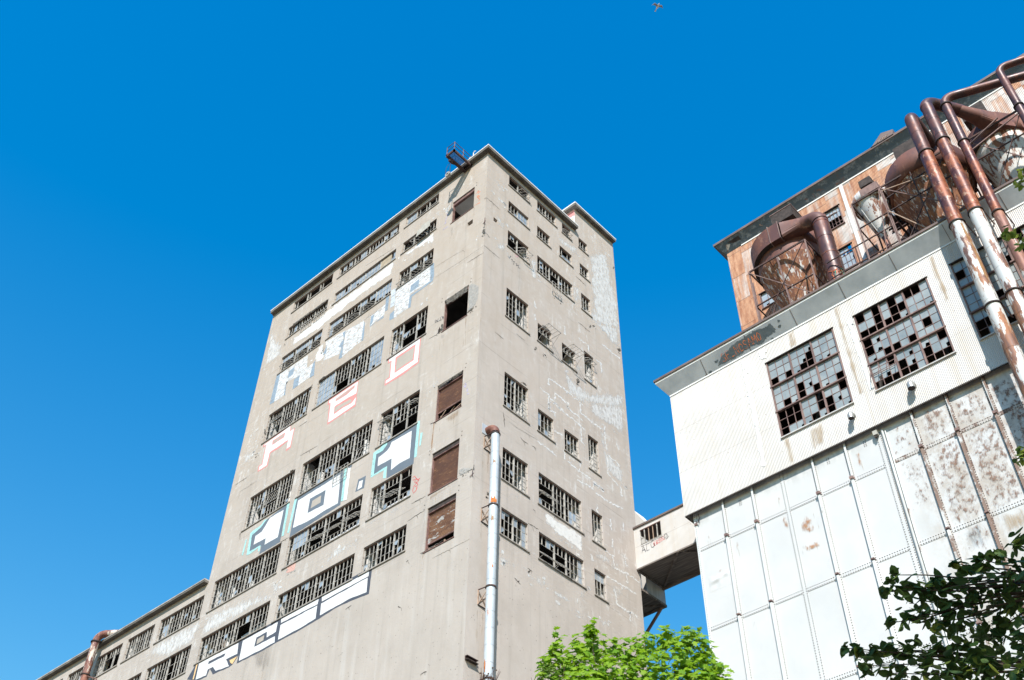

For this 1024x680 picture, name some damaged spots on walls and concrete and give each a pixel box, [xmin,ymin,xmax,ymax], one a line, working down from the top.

rust [924,409,978,522]
rust [957,380,1024,505]